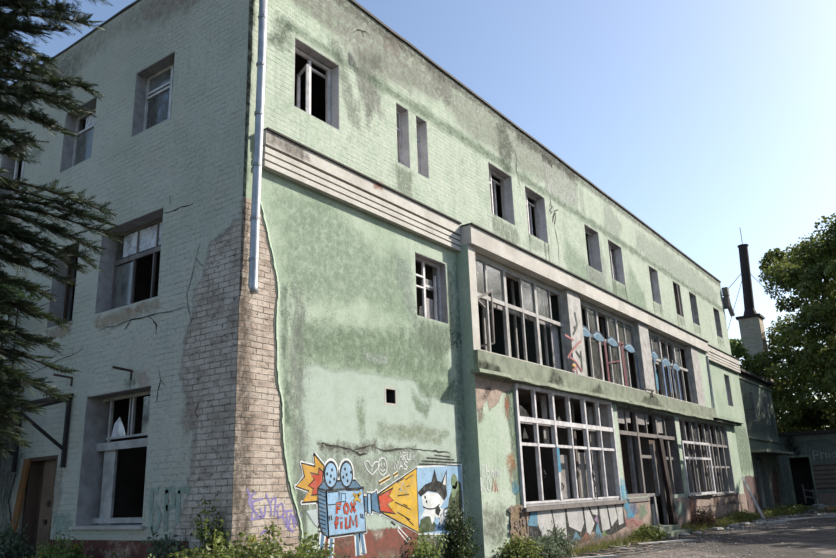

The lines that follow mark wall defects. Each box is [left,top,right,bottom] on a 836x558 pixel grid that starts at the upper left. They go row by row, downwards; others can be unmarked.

leakage [296,0,720,307]
crack [103,245,203,330]
flaking render [174,196,304,557]
leakage [282,270,465,488]
crack [317,441,450,456]
flaking render [475,375,513,421]